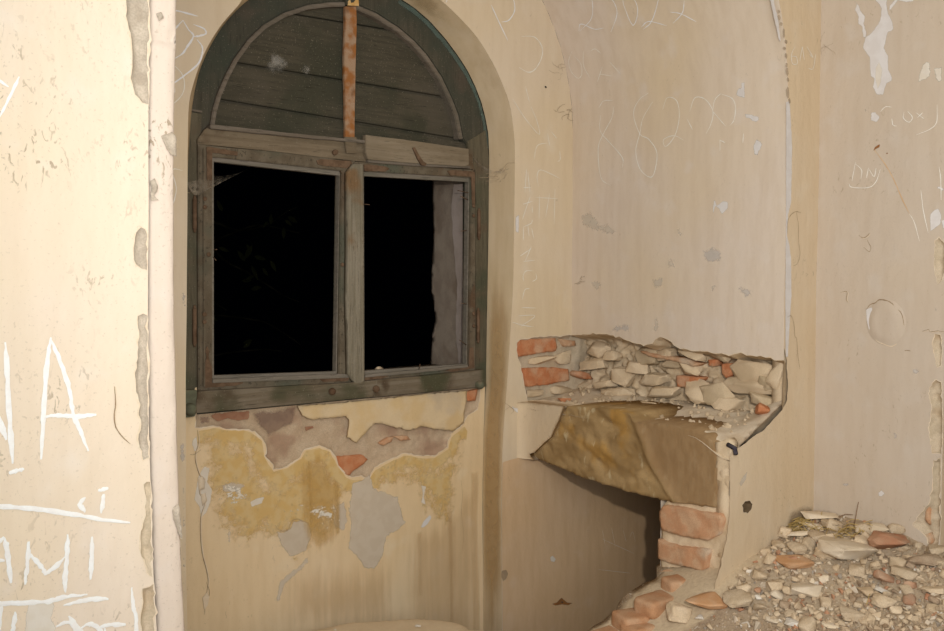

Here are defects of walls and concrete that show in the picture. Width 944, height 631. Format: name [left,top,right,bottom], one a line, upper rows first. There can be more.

spalling [124,0,164,105]
peeling [855,0,913,95]
spalling [150,179,158,201]
spalling [161,132,177,156]
spalling [133,227,149,270]
spalling [516,0,792,572]
spalling [133,313,150,461]
spalling [912,334,943,544]
spalling [139,481,158,631]
spalling [172,504,182,539]
spalling [181,388,480,600]